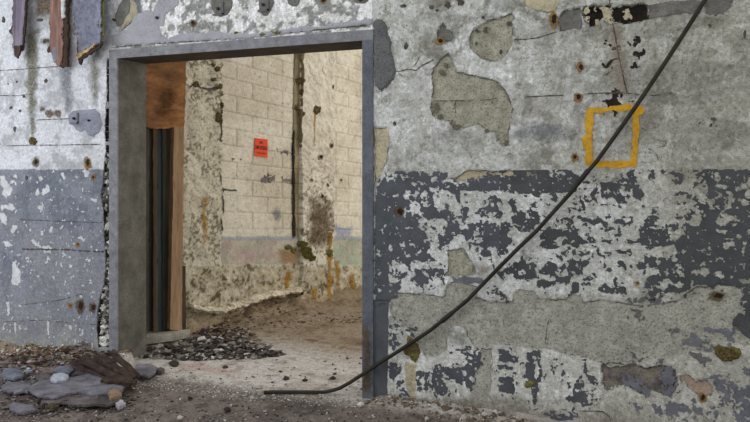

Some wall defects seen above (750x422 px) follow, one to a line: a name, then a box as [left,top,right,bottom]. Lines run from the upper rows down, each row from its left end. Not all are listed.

spalling [470,13,514,62]
corrosion [549,11,558,29]
water stain [27,30,70,134]
crack [395,58,433,76]
spalling [430,54,514,146]
peeling [0,58,109,348]
water stain [310,198,350,245]
corrosion [327,232,341,300]
spalling [373,119,750,422]
corrosion [68,300,96,314]
corrosion [709,292,724,301]